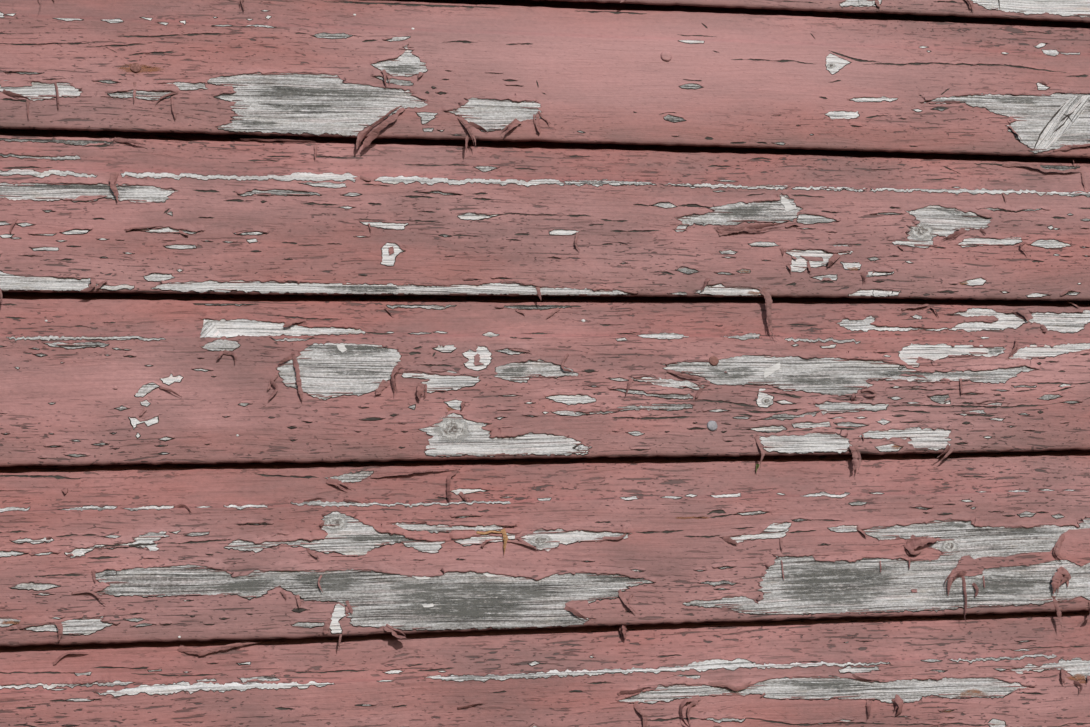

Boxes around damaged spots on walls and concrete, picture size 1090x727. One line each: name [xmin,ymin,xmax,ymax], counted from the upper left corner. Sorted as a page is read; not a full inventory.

peeling [965,0,1090,19]
peeling [824,51,852,75]
peeling [0,35,550,152]
peeling [662,112,687,123]
peeling [825,93,899,121]
peeling [911,80,1090,173]
peeling [0,137,1090,256]
peeling [359,217,410,267]
peeling [719,240,902,298]
peeling [0,264,1090,648]
peeling [0,661,335,702]
peeling [424,637,1090,727]